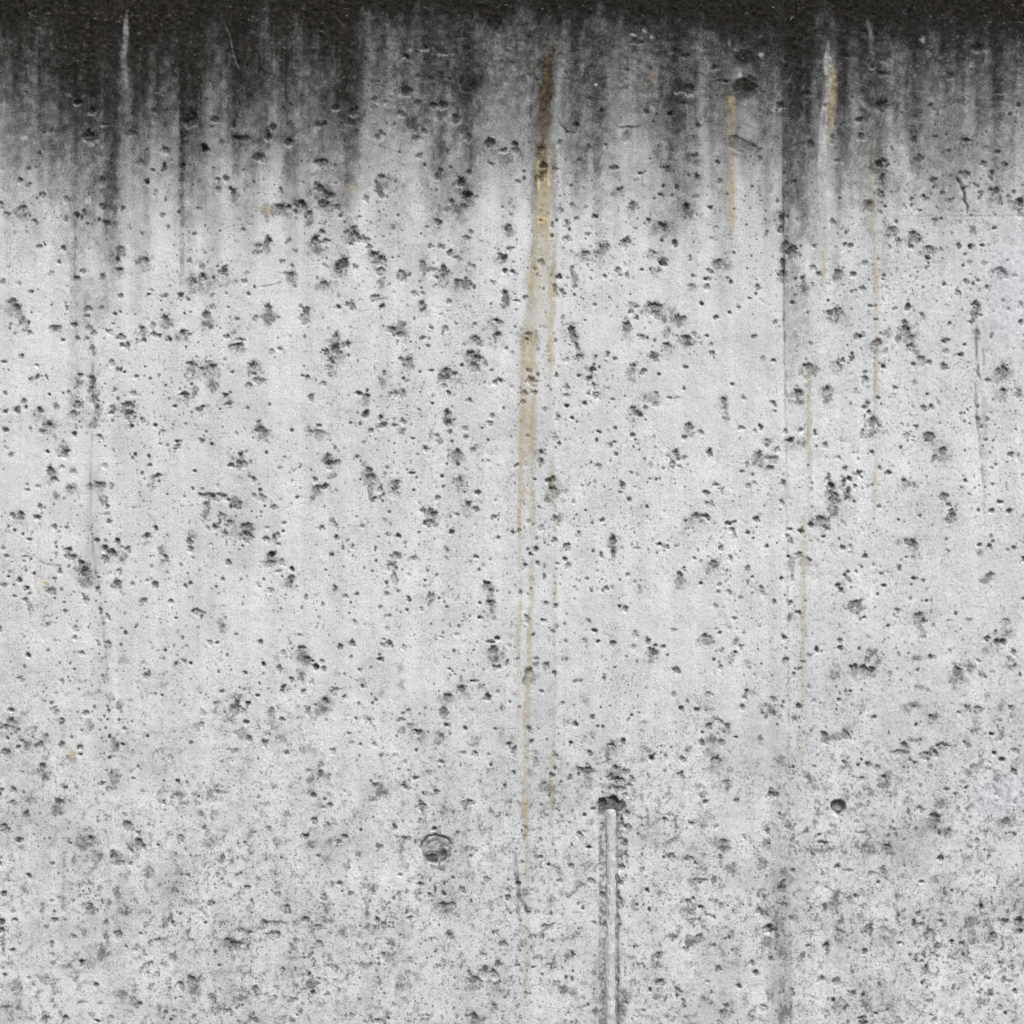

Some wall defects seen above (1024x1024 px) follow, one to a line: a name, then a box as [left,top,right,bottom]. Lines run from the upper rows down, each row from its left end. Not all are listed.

water stain [0,0,1024,209]
rust [536,51,554,241]